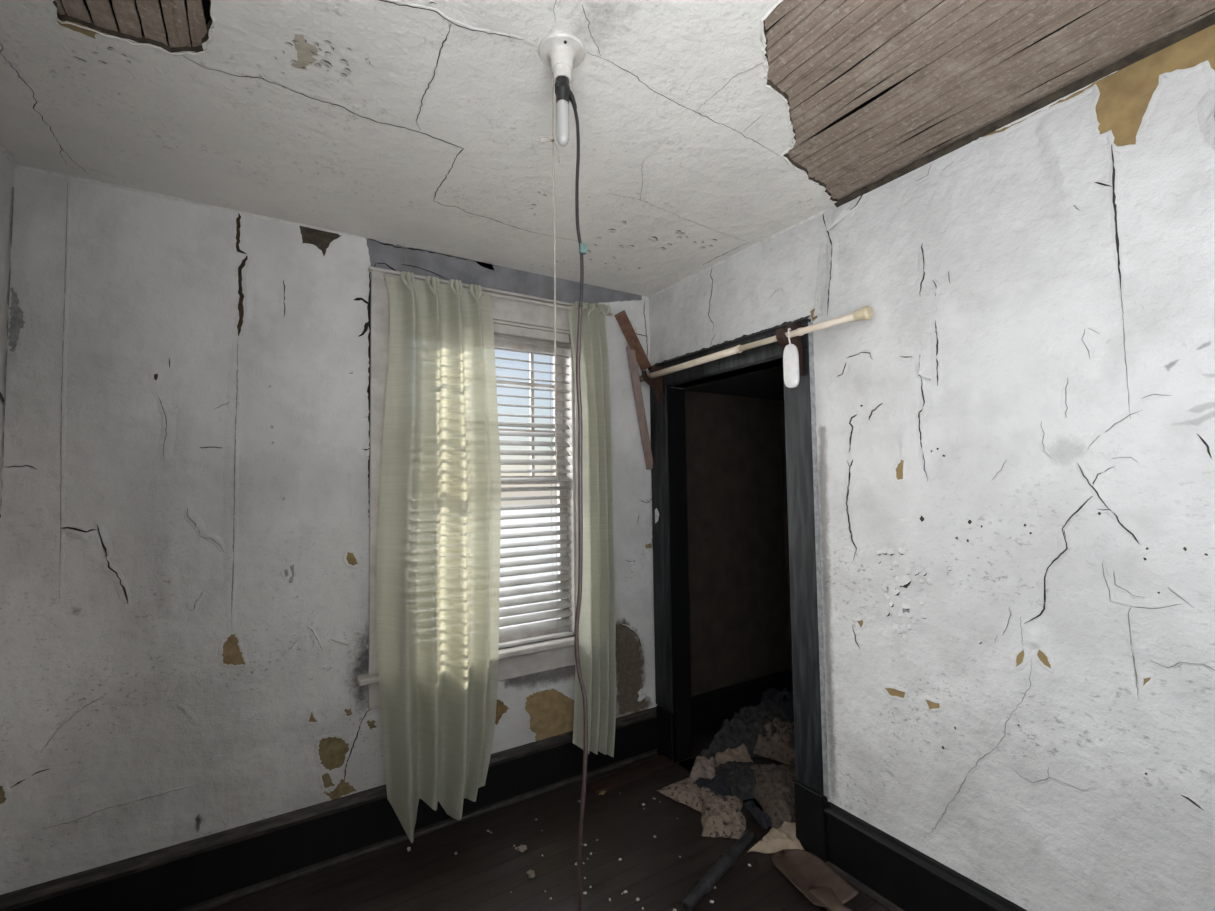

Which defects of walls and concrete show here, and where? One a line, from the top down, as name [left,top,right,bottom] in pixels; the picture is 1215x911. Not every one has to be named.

spalling [57,6,217,76]
crack [183,0,576,241]
peeling [759,0,1215,207]
peeling [295,225,345,262]
crack [823,215,832,315]
crack [918,243,926,293]
crack [193,255,248,624]
crack [923,145,1172,841]
peeling [217,631,250,669]
peeling [305,709,360,801]
peeling [495,686,575,742]
leakage [616,619,650,715]